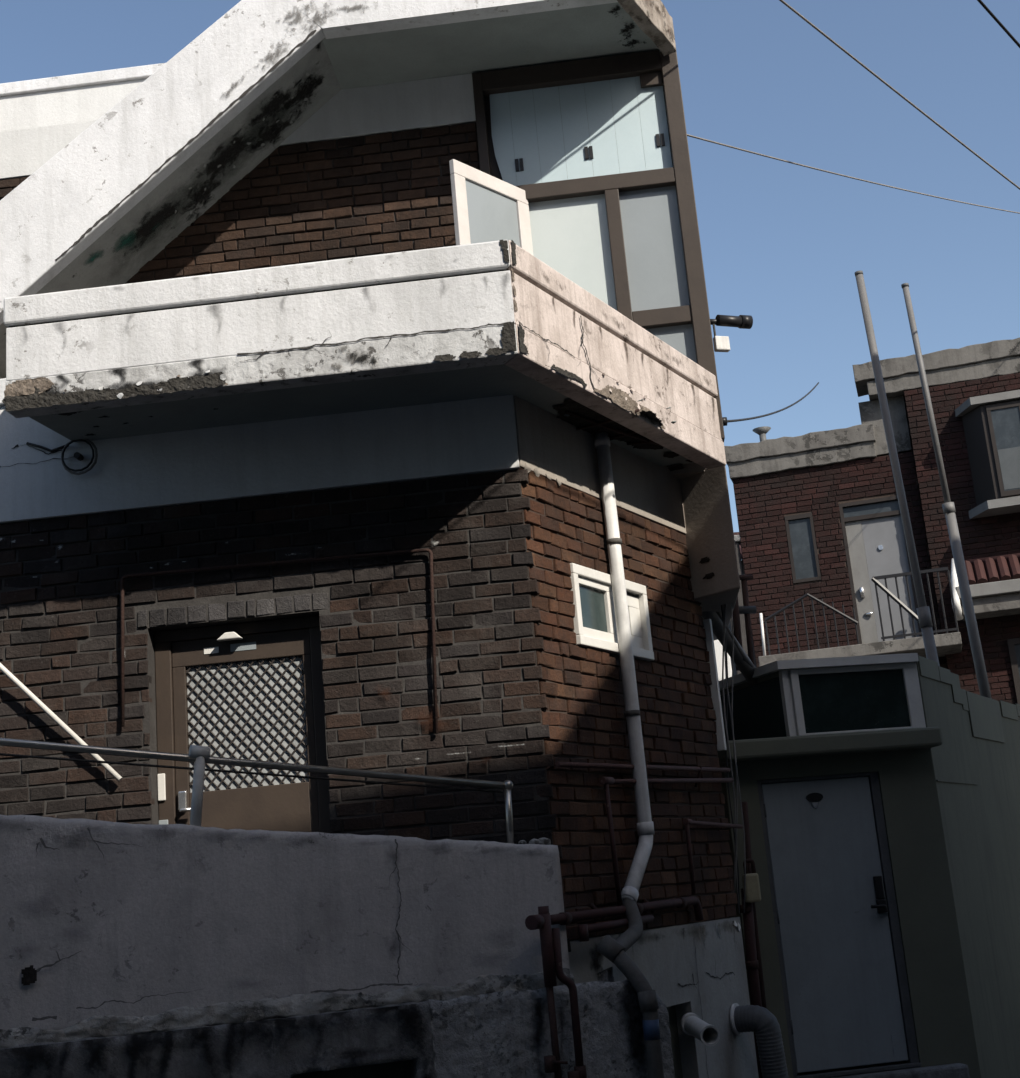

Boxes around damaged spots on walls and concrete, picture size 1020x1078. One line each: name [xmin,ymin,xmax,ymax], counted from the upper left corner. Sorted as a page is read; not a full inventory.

peeling [331,345,377,369]
spalling [2,370,228,416]